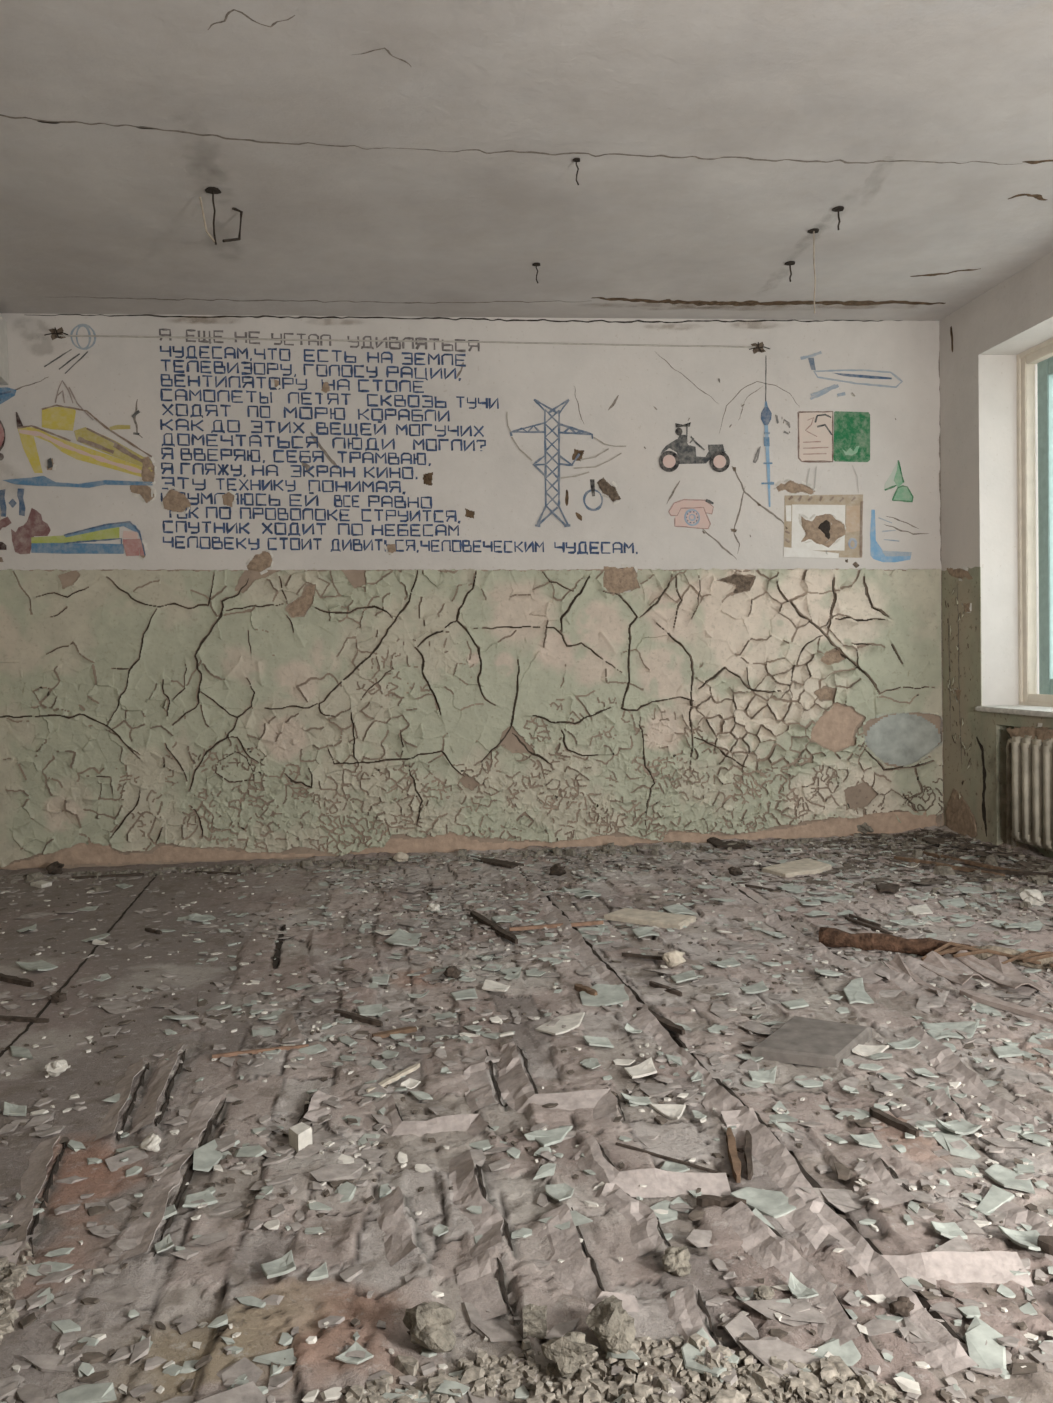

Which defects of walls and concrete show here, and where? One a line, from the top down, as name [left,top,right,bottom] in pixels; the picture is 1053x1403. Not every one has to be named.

flaking render [130,456,191,514]
flaking render [423,472,433,486]
flaking render [595,477,621,504]
flaking render [773,479,817,496]
flaking render [0,514,1053,1032]
crack [0,875,157,1057]
peeling [0,1136,66,1265]
peeling [94,1042,186,1141]
peeling [115,1095,226,1264]
peeling [298,1090,340,1123]
peeling [374,871,1053,1377]
crack [520,873,969,1356]